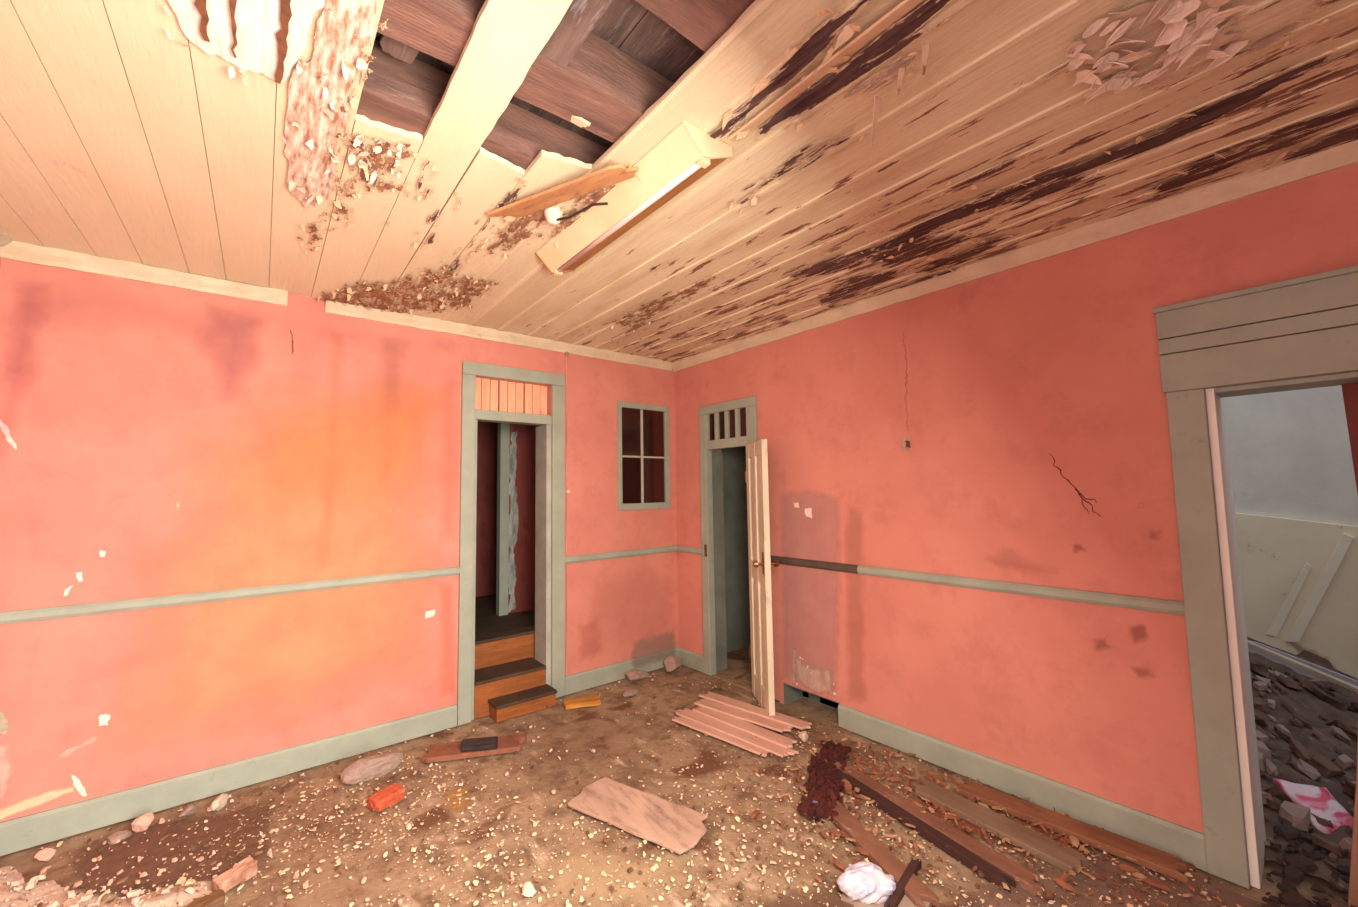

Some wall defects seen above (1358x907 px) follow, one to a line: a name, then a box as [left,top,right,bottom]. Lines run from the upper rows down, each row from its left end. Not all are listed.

peeling [164,0,465,254]
peeling [316,178,618,315]
peeling [730,126,864,214]
peeling [710,0,954,142]
peeling [780,49,1358,309]
peeling [1017,0,1253,104]
crack [1050,454,1101,517]
spalling [59,714,110,758]